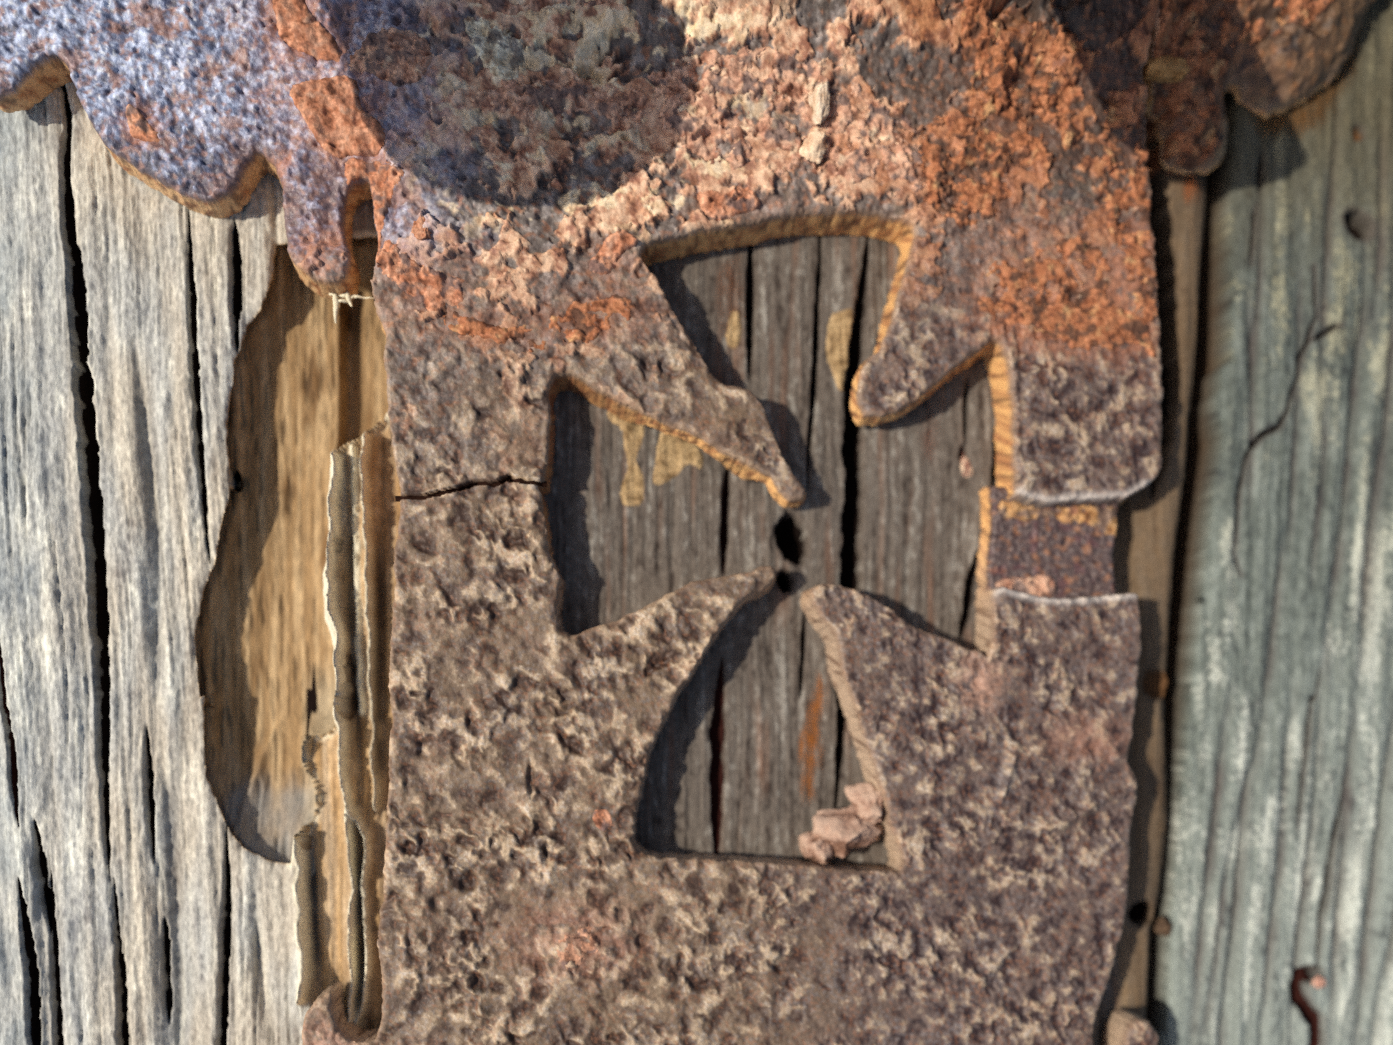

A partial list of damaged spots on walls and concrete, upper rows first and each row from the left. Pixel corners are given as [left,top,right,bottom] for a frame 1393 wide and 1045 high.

rust [125,104,159,142]
rust [272,0,635,353]
rust [477,0,1334,358]
crack [1233,268,1339,576]
crack [395,475,547,502]
rust [998,500,1118,537]
rust [995,575,1056,597]
rust [592,809,612,831]
rust [557,924,605,972]